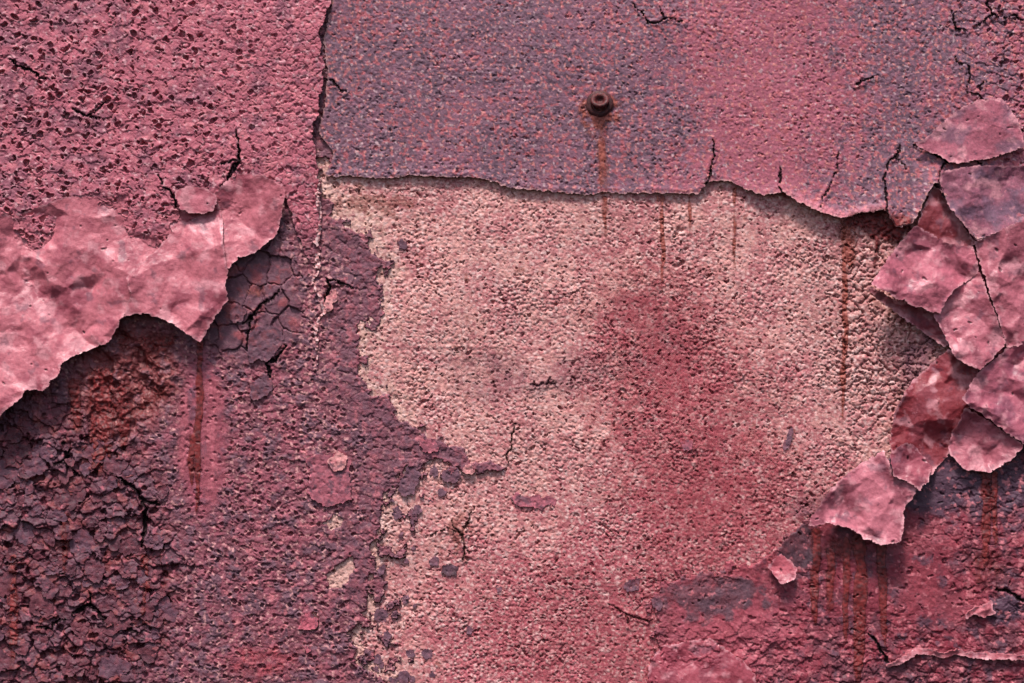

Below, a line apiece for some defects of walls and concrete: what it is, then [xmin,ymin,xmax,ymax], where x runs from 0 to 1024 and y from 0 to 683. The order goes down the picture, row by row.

crack [950,0,1023,100]
rust [579,90,622,230]
crack [705,139,716,185]
peeling [0,172,286,416]
crack [242,289,287,378]
spalling [316,98,1024,683]
peeling [306,451,352,531]
rust [810,528,888,683]